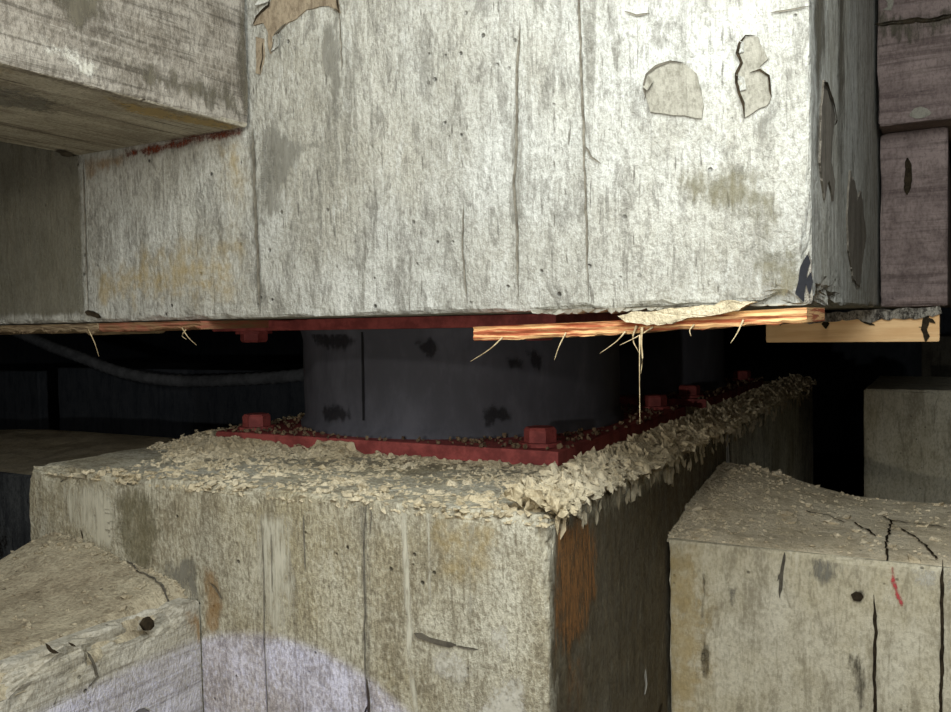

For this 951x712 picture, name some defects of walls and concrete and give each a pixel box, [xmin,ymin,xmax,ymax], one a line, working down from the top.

peeling [253,0,341,75]
peeling [643,60,704,119]
peeling [735,35,772,118]
rust [125,128,241,156]
crack [512,28,520,296]
crack [577,0,601,301]
crack [363,504,372,712]
crack [777,552,786,598]
crack [808,511,947,712]